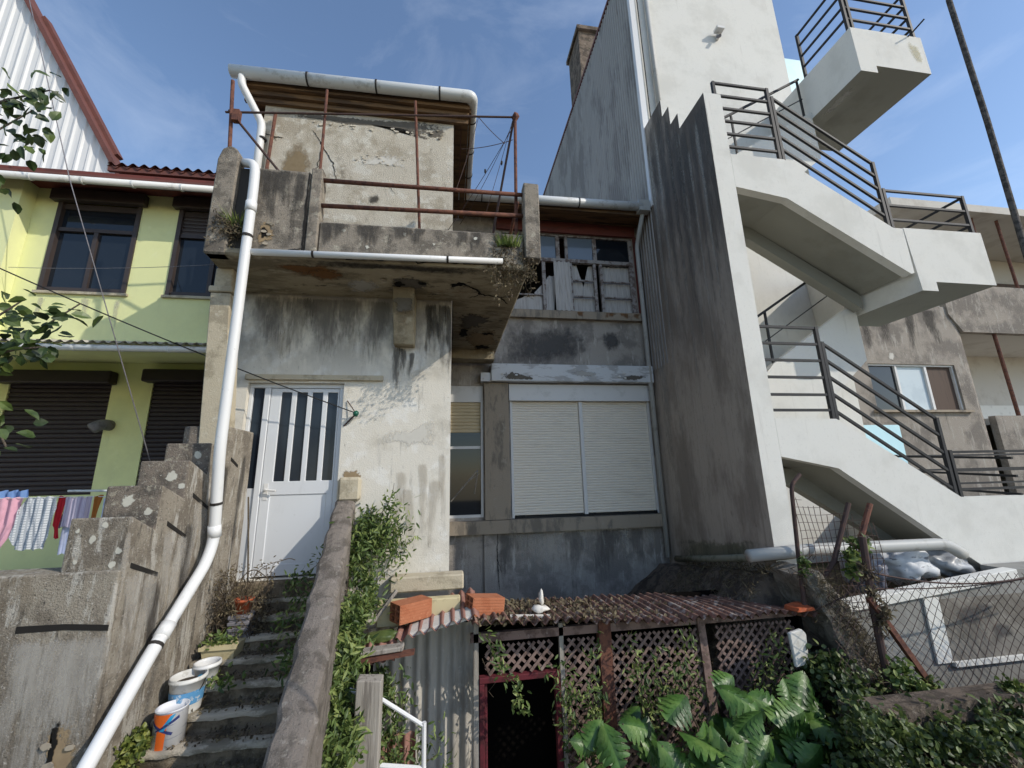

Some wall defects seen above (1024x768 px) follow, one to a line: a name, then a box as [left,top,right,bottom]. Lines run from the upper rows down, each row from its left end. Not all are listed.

crack [288,132,336,250]
crack [415,261,507,304]
leakage [425,305,451,356]
leakage [512,329,579,361]
leakage [604,333,618,349]
leakage [394,348,414,381]
peeling [501,372,533,380]